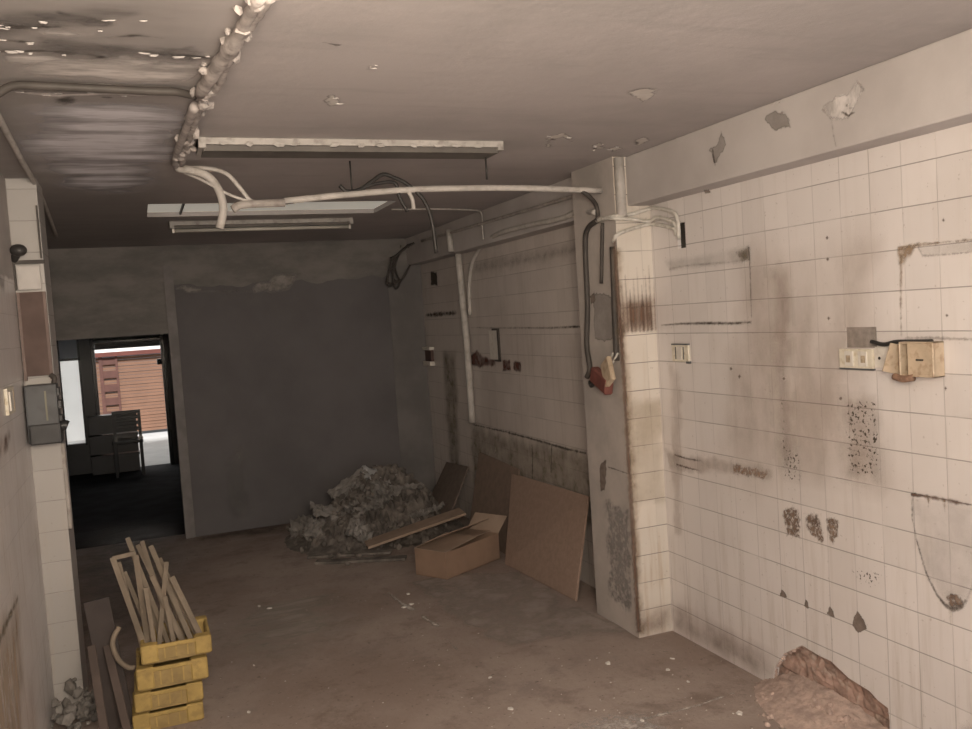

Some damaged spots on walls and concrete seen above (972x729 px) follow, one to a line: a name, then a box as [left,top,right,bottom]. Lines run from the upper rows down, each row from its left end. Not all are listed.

peeling [765,100,789,130]
peeling [824,84,863,119]
peeling [709,134,726,164]
corrosion [614,242,652,632]
mould [846,401,878,474]
leakage [933,588,963,611]
flaking render [779,647,890,729]